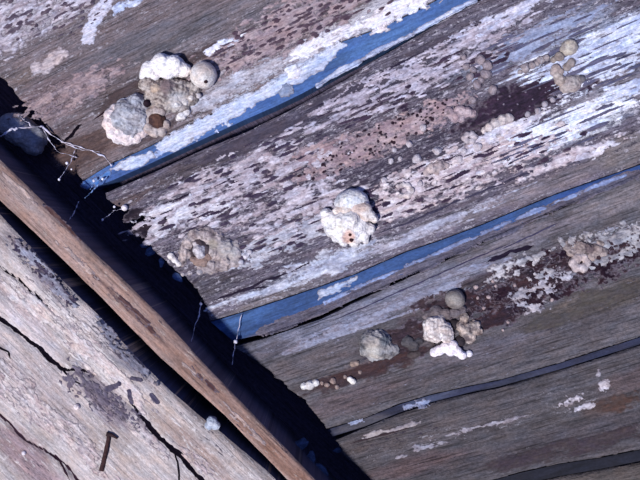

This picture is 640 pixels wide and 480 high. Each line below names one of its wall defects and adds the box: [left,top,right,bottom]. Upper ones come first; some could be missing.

peeling [80,0,640,338]
peeling [280,244,640,356]
crack [0,316,88,384]
crack [0,414,79,480]
crack [131,404,205,480]